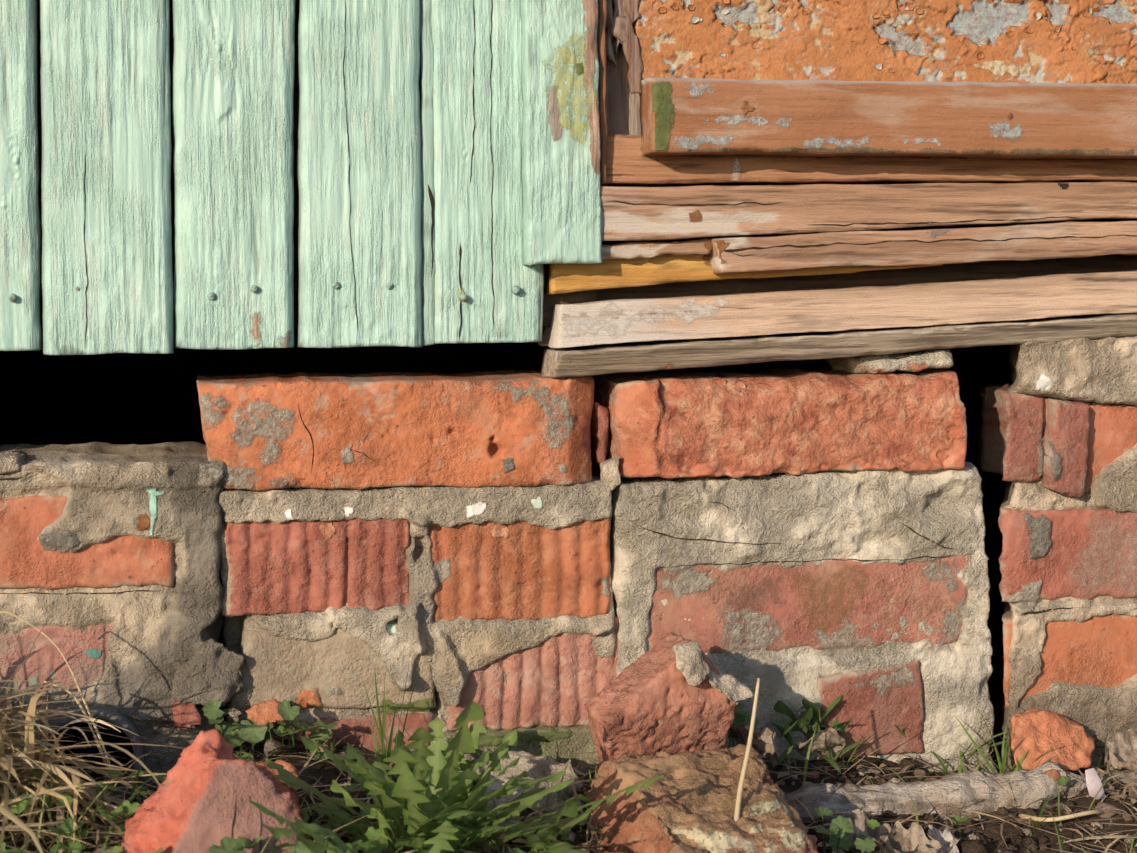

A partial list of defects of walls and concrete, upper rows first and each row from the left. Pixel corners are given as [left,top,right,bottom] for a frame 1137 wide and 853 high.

peeling [658,0,808,30]
peeling [872,0,931,72]
peeling [947,0,1136,80]
peeling [689,83,714,97]
peeling [675,115,792,150]
peeling [804,136,868,148]
peeling [989,122,1022,139]
crack [428,0,494,340]